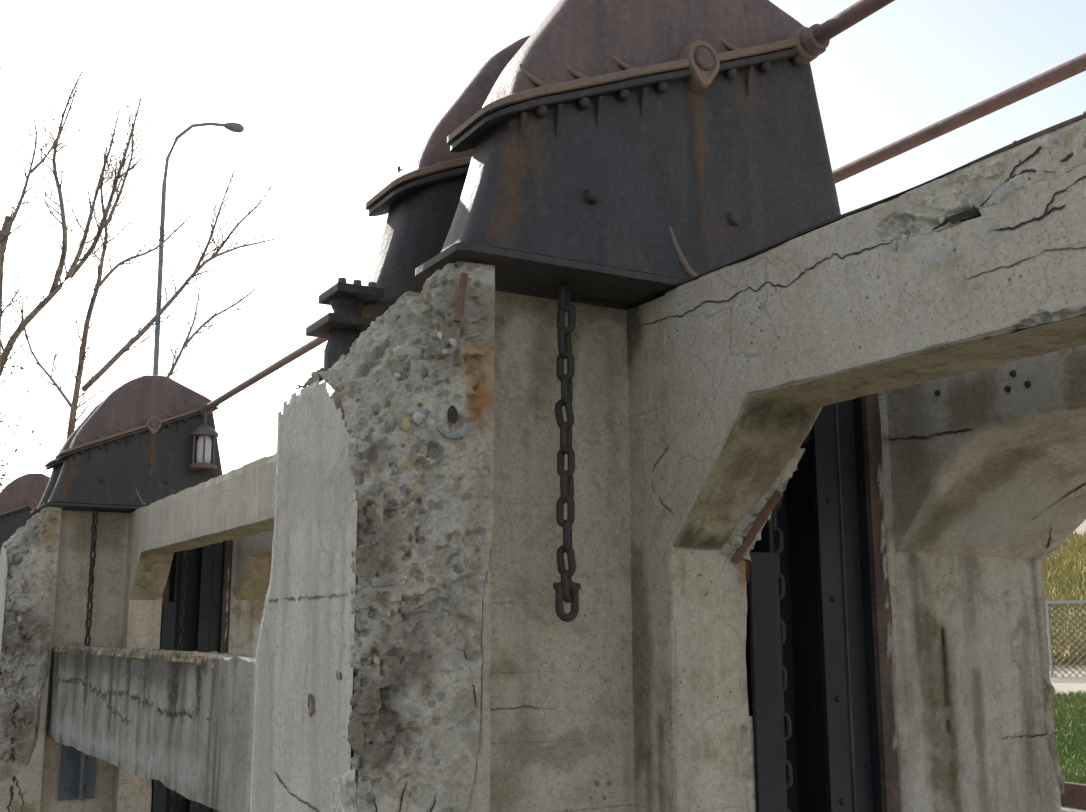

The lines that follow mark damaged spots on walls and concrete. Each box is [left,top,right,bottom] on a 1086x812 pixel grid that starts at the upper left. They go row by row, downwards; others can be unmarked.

peeling [876,111,1086,251]
crack [978,139,1086,232]
crack [638,238,902,328]
crack [965,247,1086,280]
spalling [979,305,1086,341]
spalling [294,261,495,812]
spalling [717,448,805,567]
spalling [0,506,218,788]
crack [58,678,210,726]
crack [6,700,25,812]
crack [373,783,406,812]